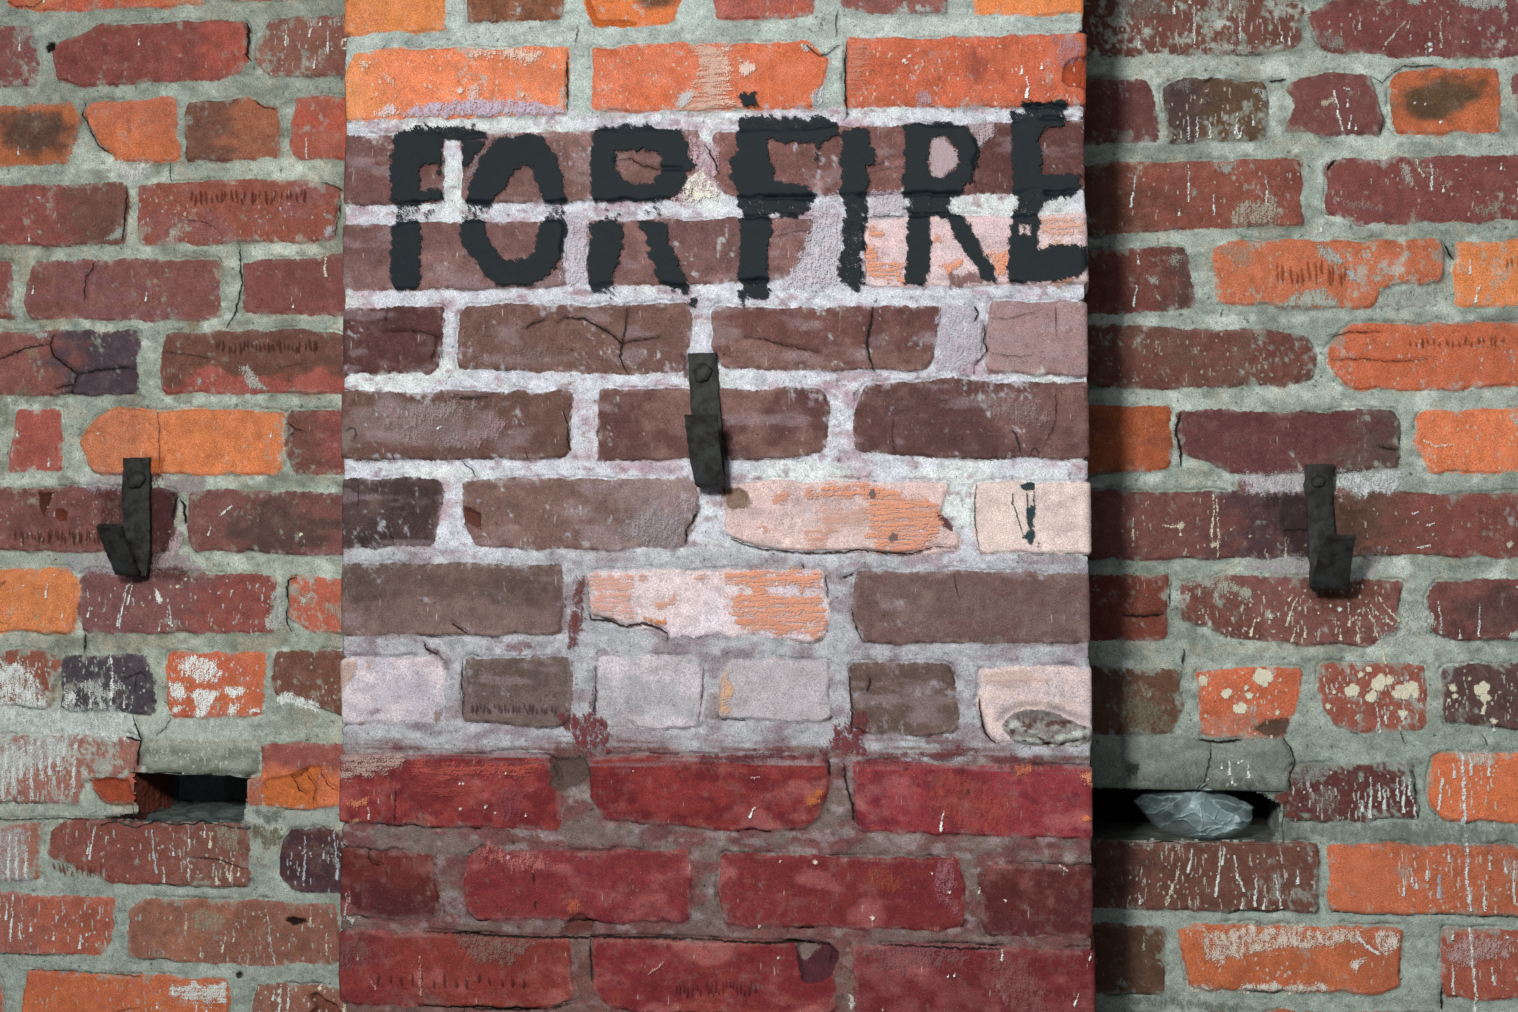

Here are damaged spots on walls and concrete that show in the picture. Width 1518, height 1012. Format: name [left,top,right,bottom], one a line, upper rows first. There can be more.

crack [0,334,135,394]
crack [525,308,659,373]
spalling [90,765,321,829]
crack [292,765,339,800]
hole [1092,787,1284,845]